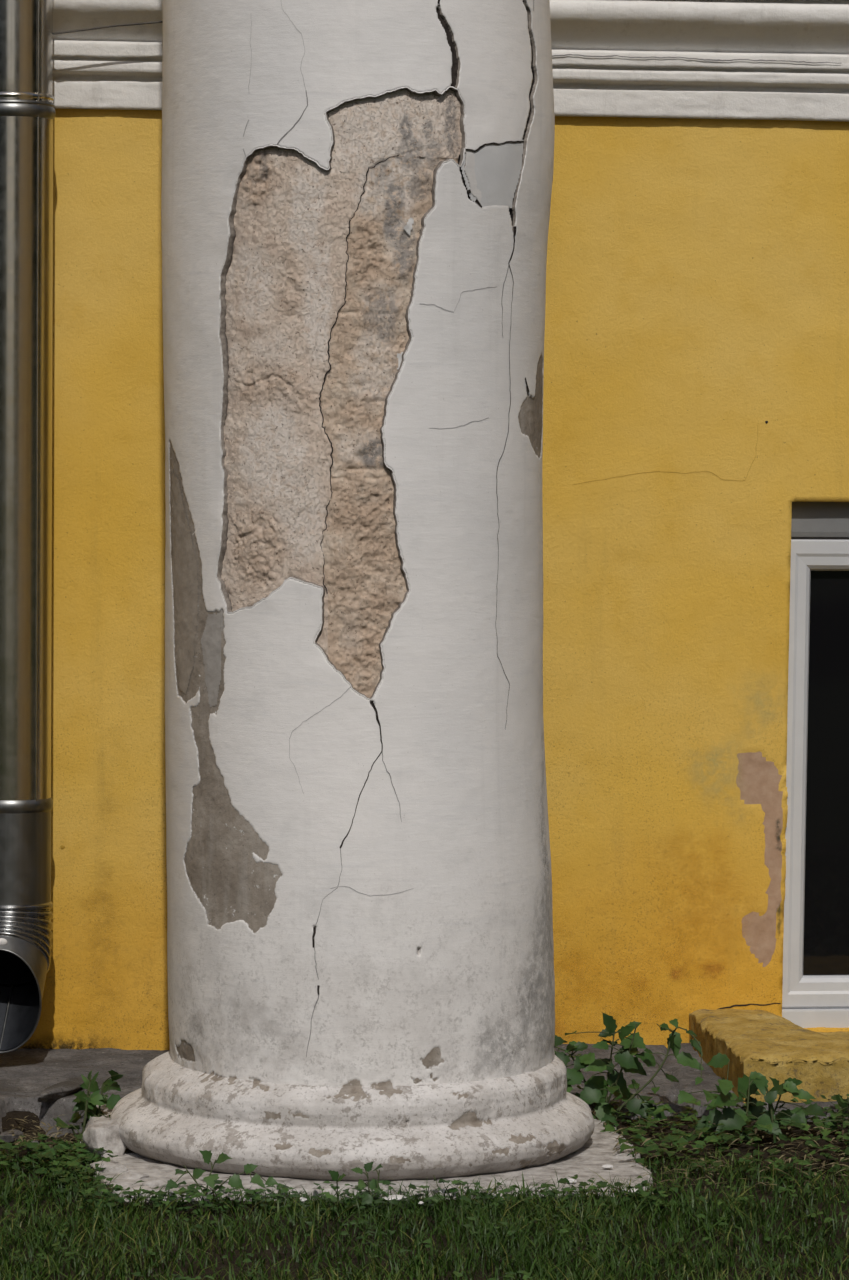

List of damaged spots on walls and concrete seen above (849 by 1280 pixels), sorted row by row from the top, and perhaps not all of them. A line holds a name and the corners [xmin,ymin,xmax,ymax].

peeling [518,355,543,458]
crack [420,0,841,728]
spalling [170,86,466,933]
crack [289,687,414,1057]
peeling [736,751,783,967]
peeling [326,1047,444,1102]
peeling [390,1153,411,1164]
peeling [448,1092,492,1130]
peeling [492,1134,566,1168]